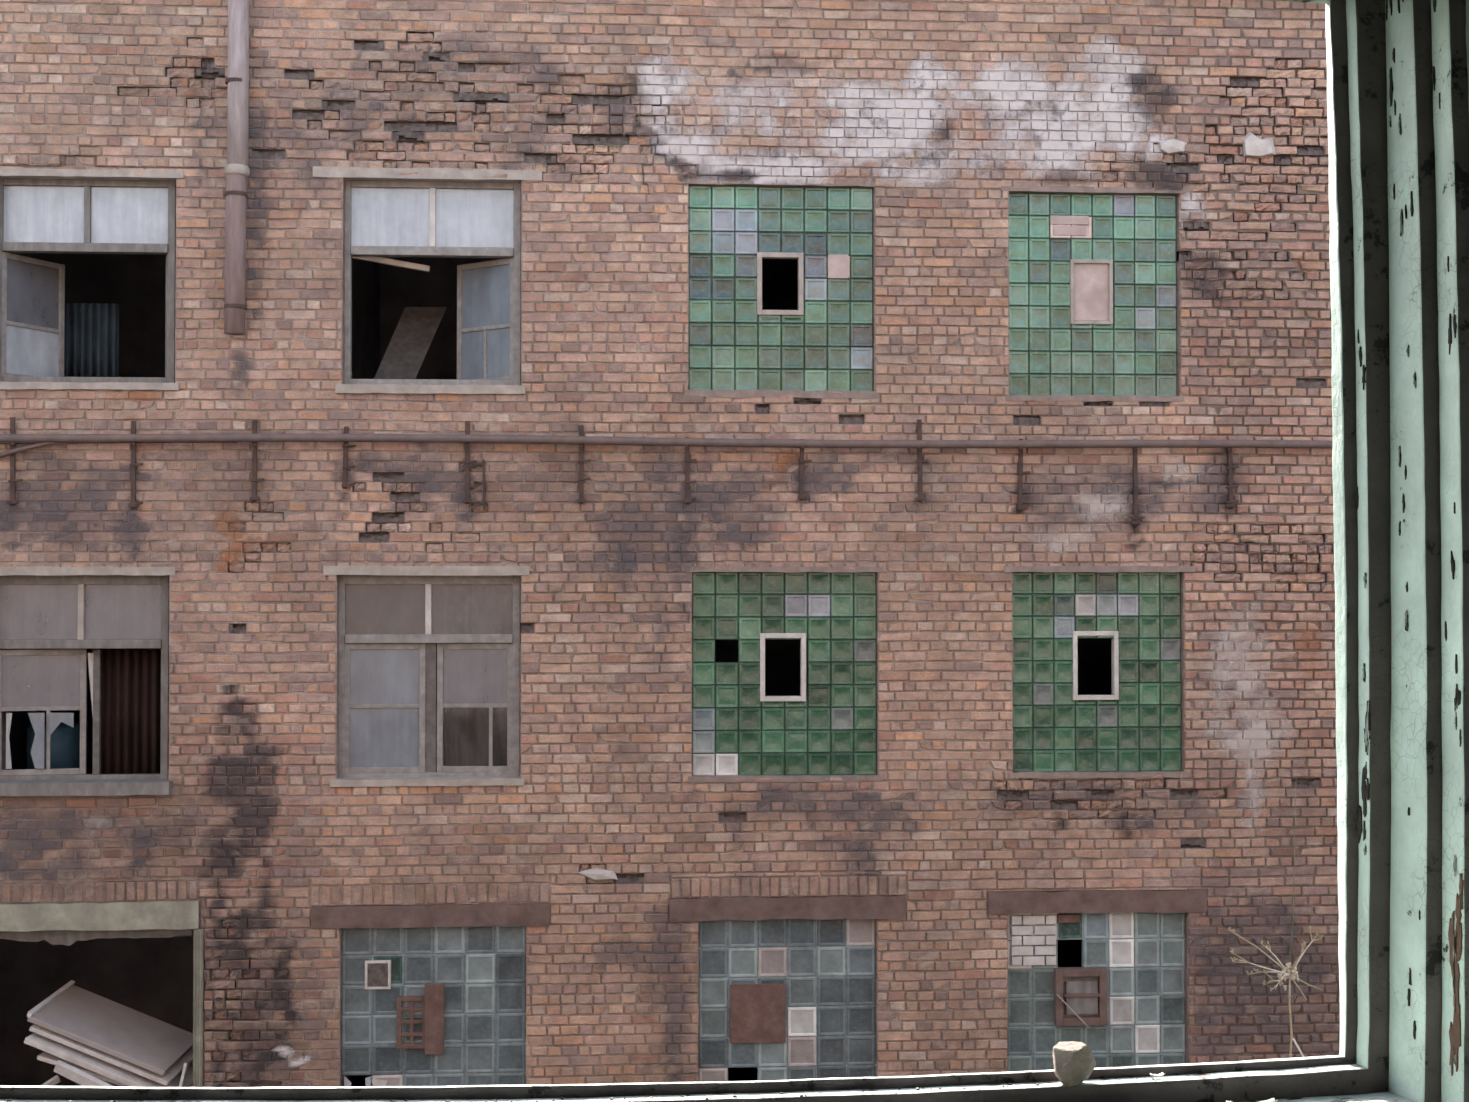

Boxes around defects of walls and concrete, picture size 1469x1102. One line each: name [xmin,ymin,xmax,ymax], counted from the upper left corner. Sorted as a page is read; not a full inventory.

spalling [284,33,669,184]
damp [763,95,787,158]
damp [1131,74,1151,89]
damp [1146,135,1164,159]
spalling [1084,59,1329,300]
spalling [354,472,480,553]
peeling [1444,621,1462,747]
spalling [991,777,1225,819]
peeling [1357,663,1371,856]
damp [210,857,271,974]
peeling [1407,968,1416,1039]
peeling [1448,854,1464,1076]